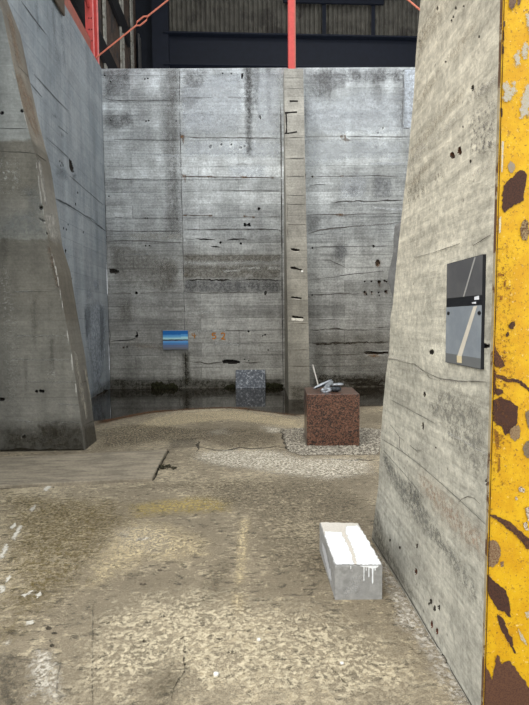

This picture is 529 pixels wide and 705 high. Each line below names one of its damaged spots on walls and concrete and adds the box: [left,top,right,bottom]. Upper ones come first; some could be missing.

damp [184,70,279,132]
peeling [500,81,529,119]
peeling [514,42,529,66]
crack [414,0,505,352]
damp [86,283,236,396]
corrosion [426,0,511,705]
crack [382,359,494,696]